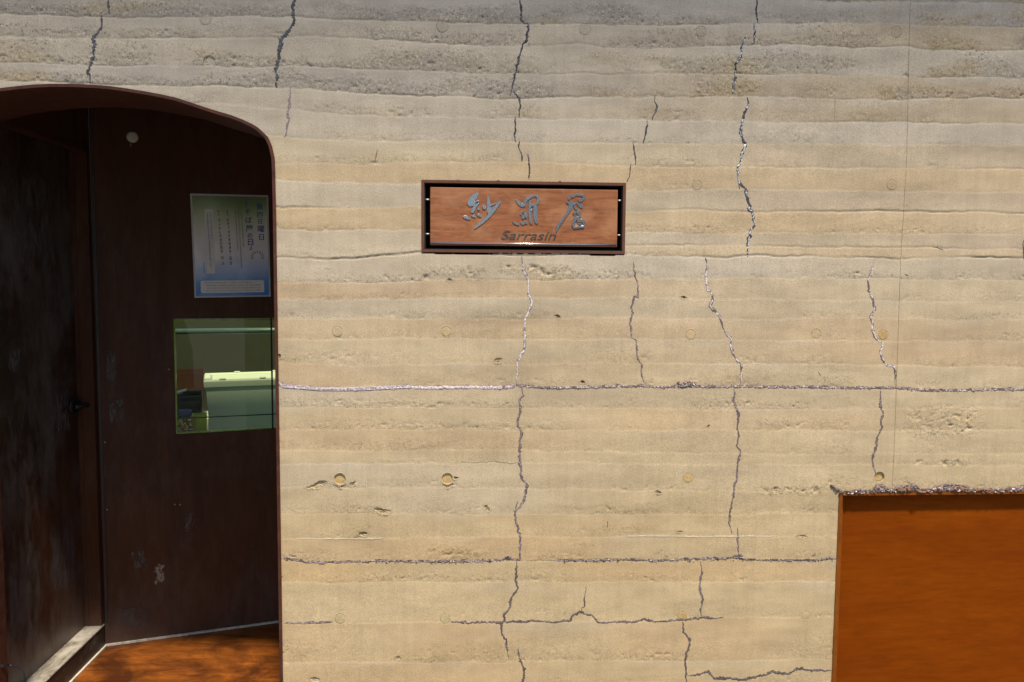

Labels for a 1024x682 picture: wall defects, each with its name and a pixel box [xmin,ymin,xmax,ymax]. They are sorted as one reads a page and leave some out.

crack [86,0,110,84]
crack [273,0,296,137]
crack [510,1,530,178]
crack [627,97,658,181]
crack [732,0,758,257]
crack [279,255,1024,682]